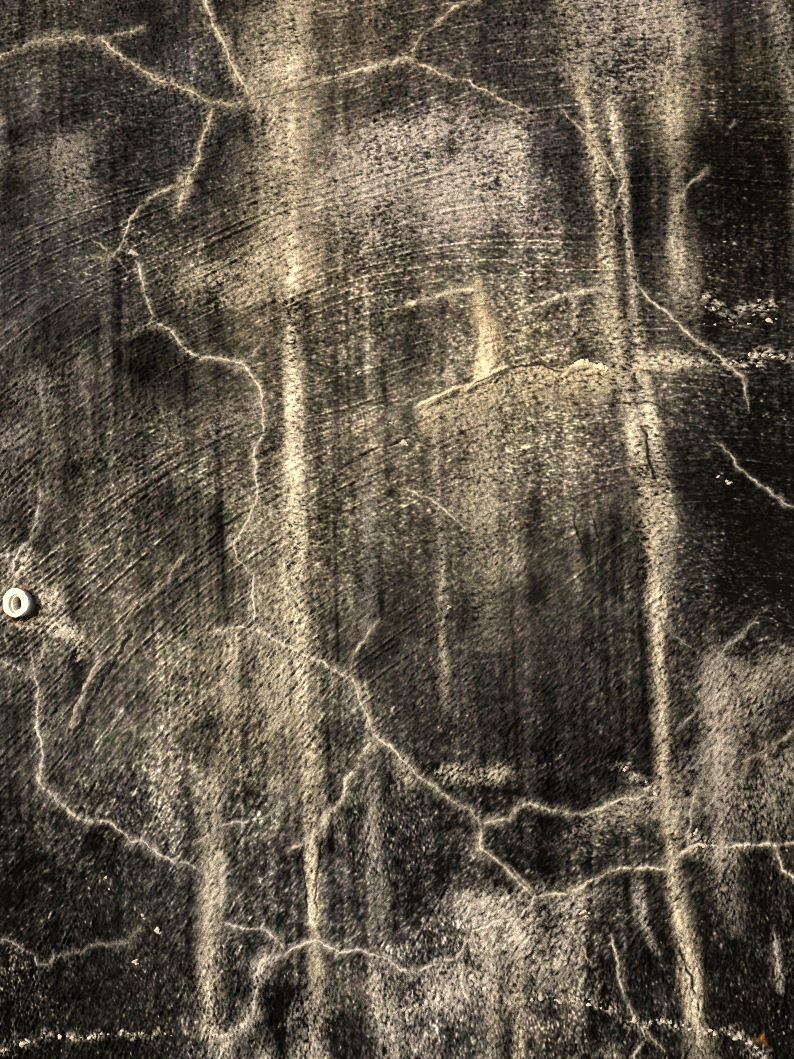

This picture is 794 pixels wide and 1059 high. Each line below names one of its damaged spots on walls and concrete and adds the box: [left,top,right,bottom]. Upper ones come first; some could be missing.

crack [0,0,531,260]
damp [331,119,536,234]
crack [566,114,629,239]
damp [472,277,498,386]
crack [0,492,42,577]
damp [219,0,320,946]
damp [559,0,792,1059]
crack [3,647,278,868]
crack [138,264,794,1059]
damp [438,765,506,781]
damp [198,768,234,1042]
damp [371,893,612,1059]